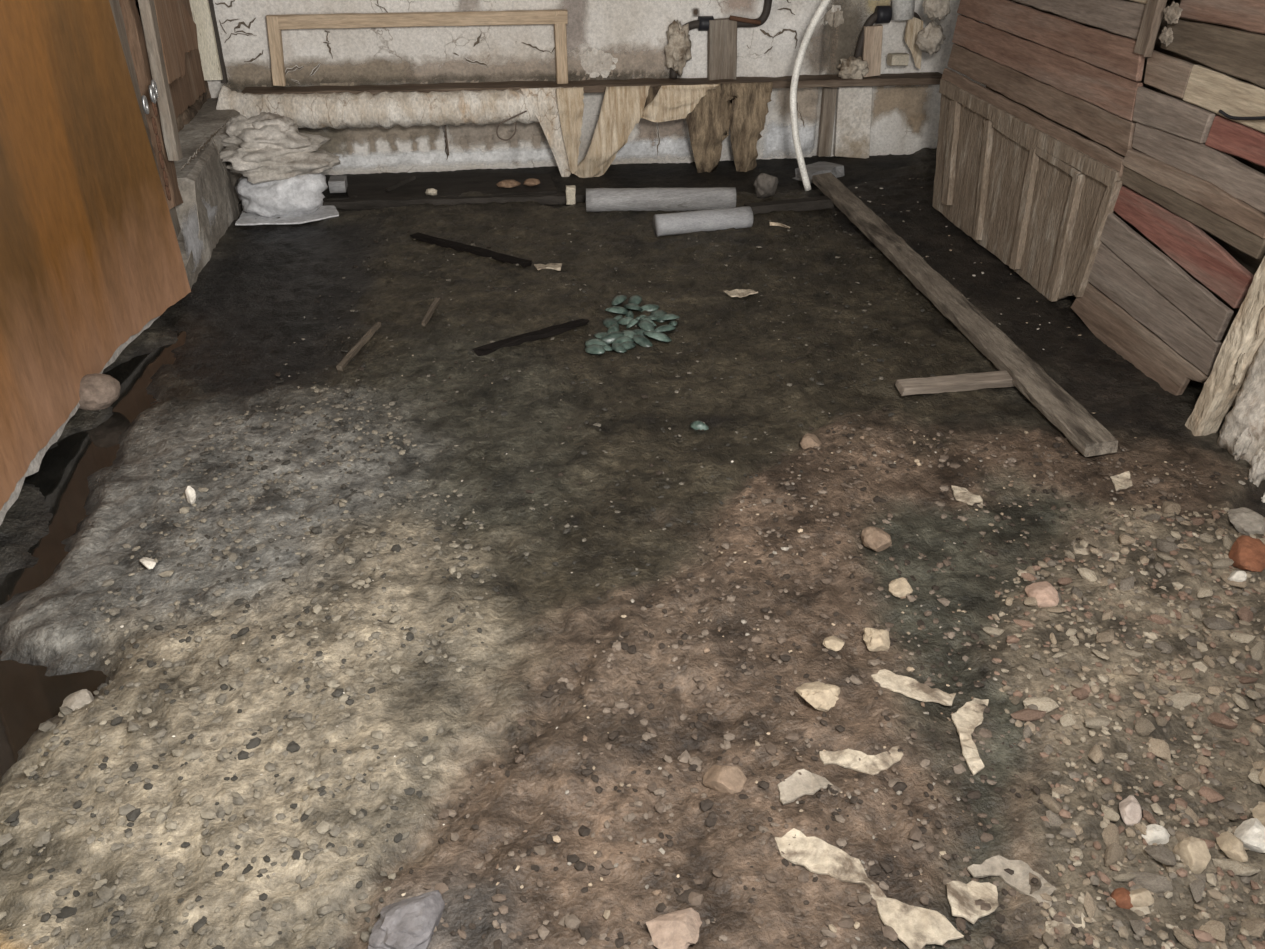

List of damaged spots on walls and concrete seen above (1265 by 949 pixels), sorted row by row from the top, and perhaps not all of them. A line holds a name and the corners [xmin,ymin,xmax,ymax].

crack [215,0,333,84]
leakage [223,0,680,92]
crack [453,33,488,67]
crack [522,42,555,54]
crack [760,0,798,54]
leakage [807,0,889,75]
leakage [298,122,553,168]
leakage [615,118,690,159]
leakage [765,88,818,155]
leakage [872,85,928,133]